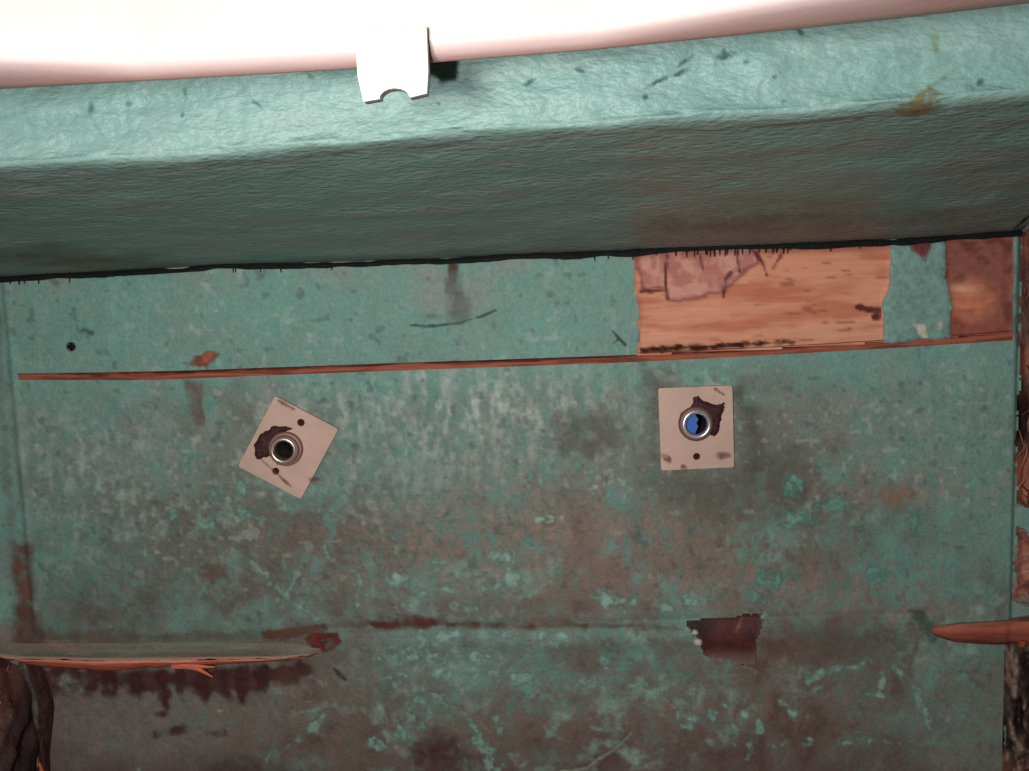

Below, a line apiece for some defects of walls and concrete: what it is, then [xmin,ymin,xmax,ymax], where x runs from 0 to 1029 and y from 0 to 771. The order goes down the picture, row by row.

peeling [634,230,1029,508]
spalling [1012,526,1029,602]
spalling [687,568,801,665]